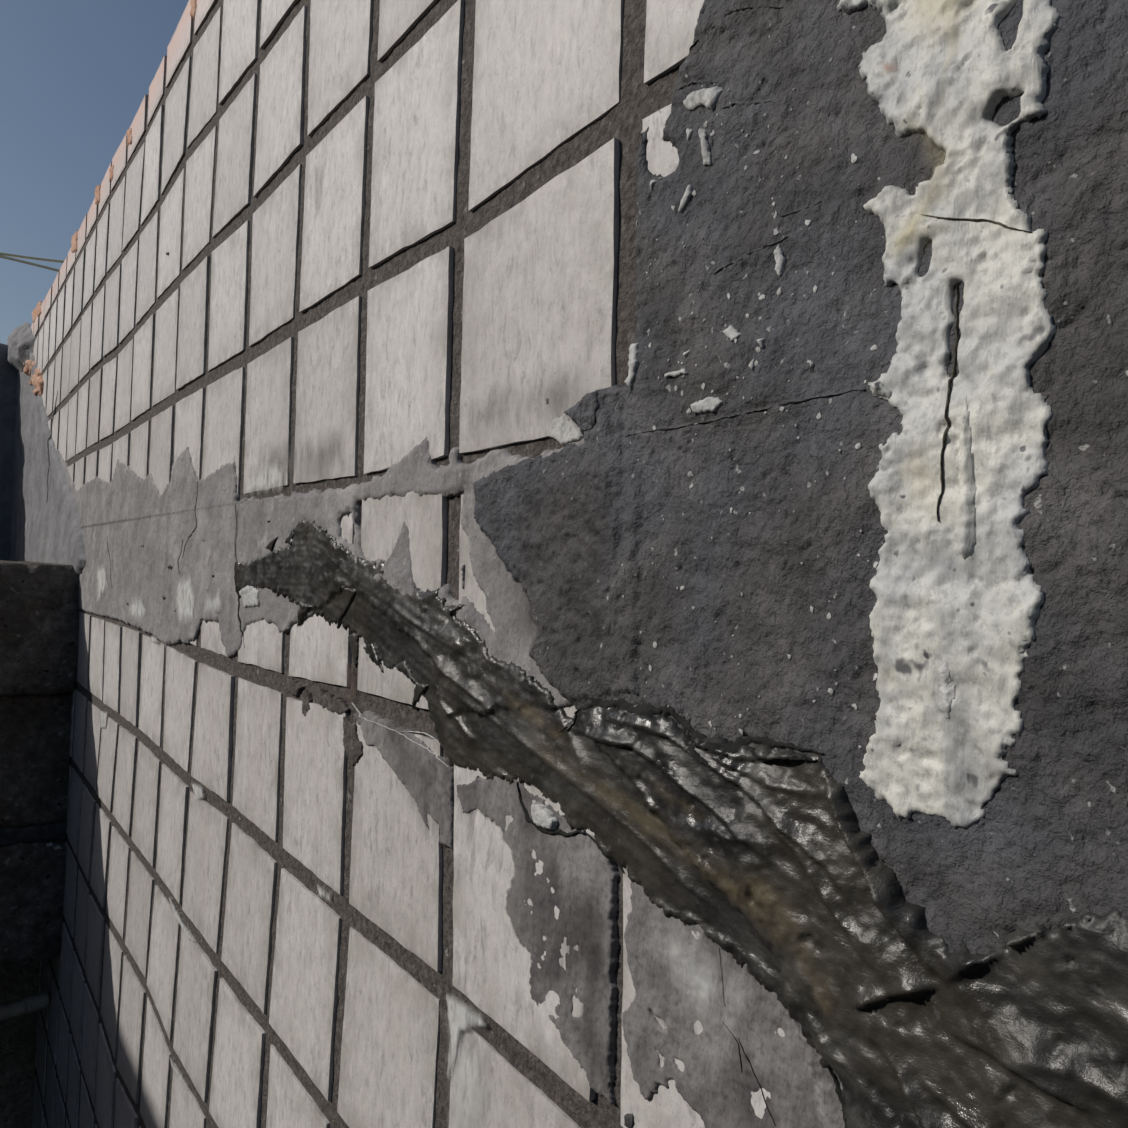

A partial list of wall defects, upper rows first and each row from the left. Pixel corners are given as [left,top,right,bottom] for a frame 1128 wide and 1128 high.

peeling [673,83,731,166]
peeling [757,197,817,300]
peeling [720,316,741,343]
peeling [624,342,651,390]
spalling [564,389,602,434]
peeling [686,383,725,436]
crack [625,389,867,437]
peeling [837,0,1062,829]
spalling [239,586,260,608]
spalling [531,800,559,830]
damp [675,956,715,1006]
damp [447,997,483,1128]